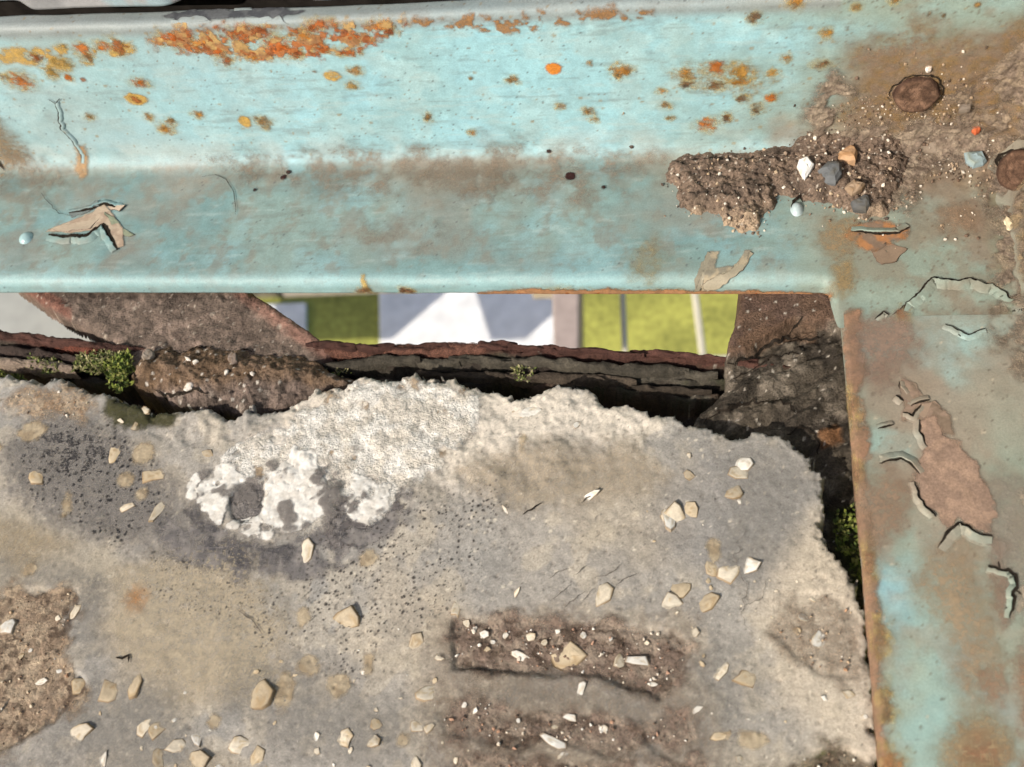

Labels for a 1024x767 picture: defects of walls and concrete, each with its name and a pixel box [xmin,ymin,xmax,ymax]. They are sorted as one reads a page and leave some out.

corrosion [0,39,135,90]
crack [50,98,88,178]
corrosion [124,80,175,134]
corrosion [147,4,653,89]
corrosion [680,62,776,113]
peeling [46,199,135,253]
peeling [693,250,754,292]
peeling [892,379,998,554]
damp [9,413,660,710]
corrosion [842,309,908,767]
damp [57,690,174,767]
damp [437,632,710,767]